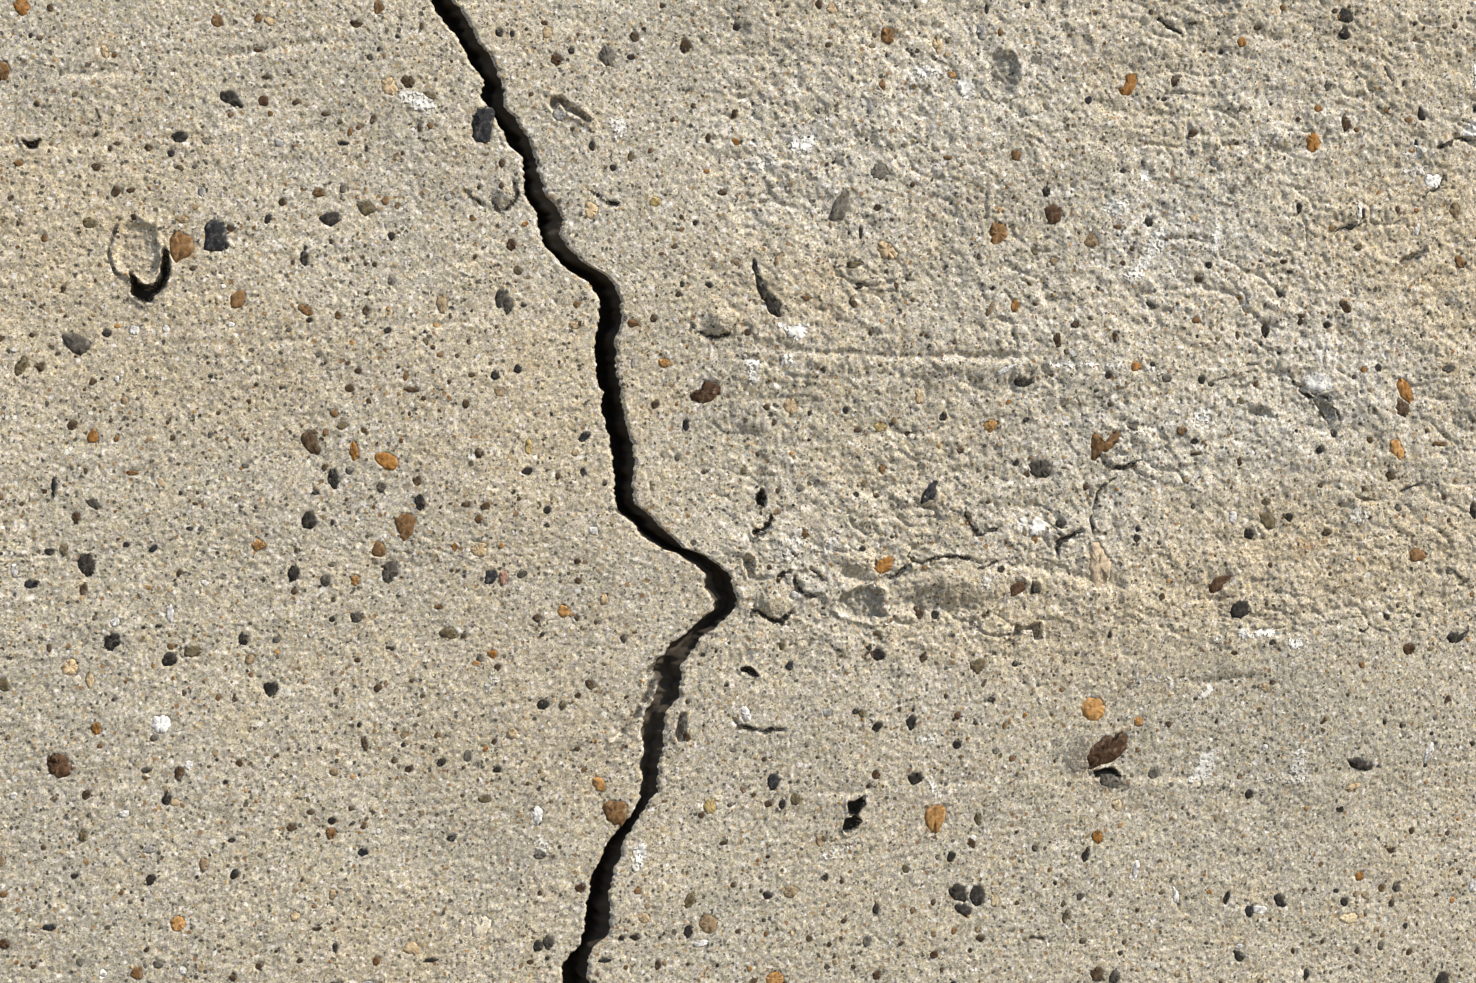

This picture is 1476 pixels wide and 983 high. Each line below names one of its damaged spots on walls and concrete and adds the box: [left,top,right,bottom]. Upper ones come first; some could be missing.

crack [431,0,827,983]